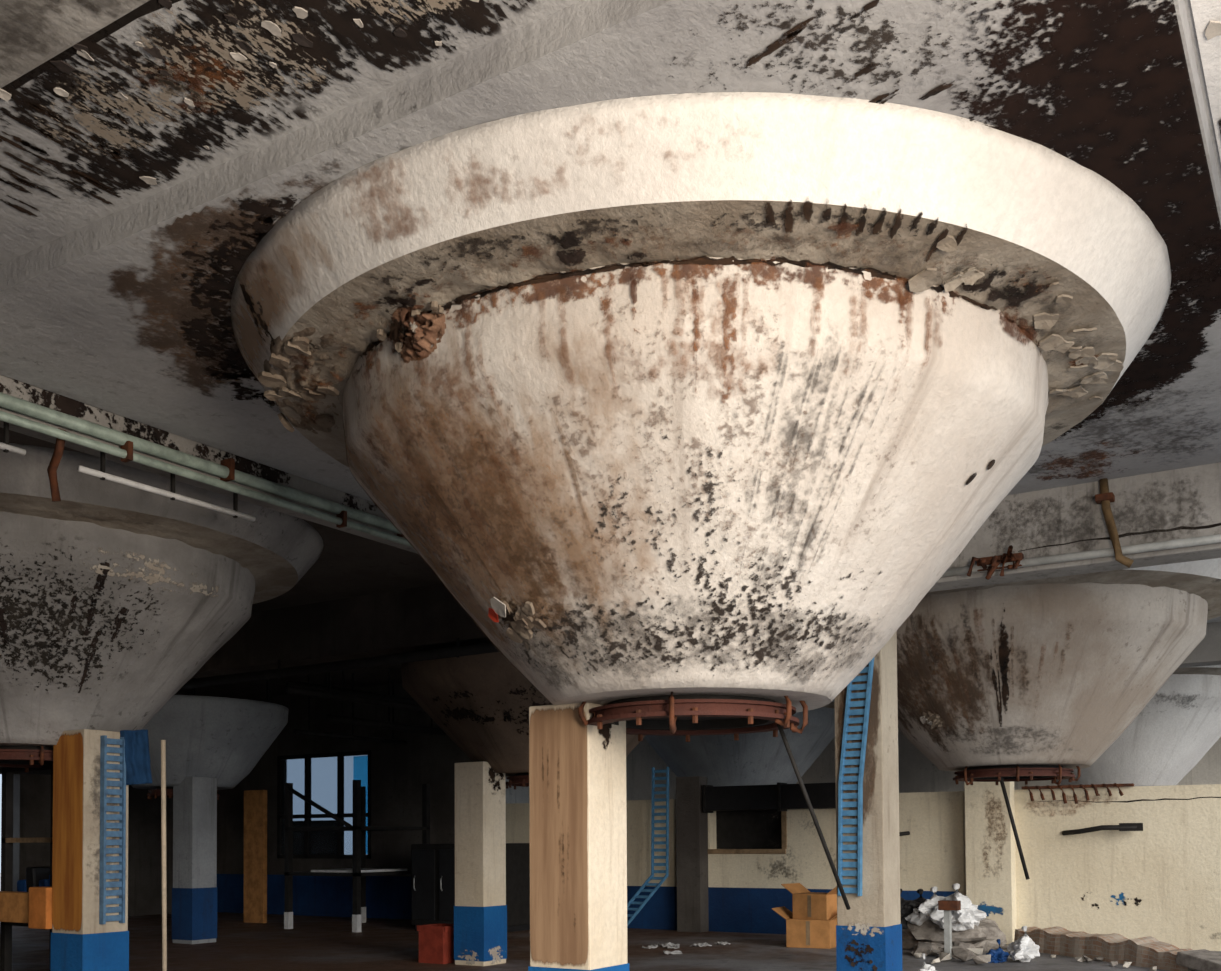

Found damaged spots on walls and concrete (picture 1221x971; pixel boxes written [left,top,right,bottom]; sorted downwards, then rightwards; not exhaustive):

corrosion [828,223,859,246]
crack [363,332,390,356]
corrosion [354,279,437,326]
crack [427,256,897,313]
corrosion [420,230,913,403]
crack [931,285,998,310]
corrosion [930,264,1051,355]
water stain [1051,237,1221,450]
water stain [0,379,291,484]
water stain [0,538,218,693]
water stain [342,382,880,966]
peeling [844,922,881,971]